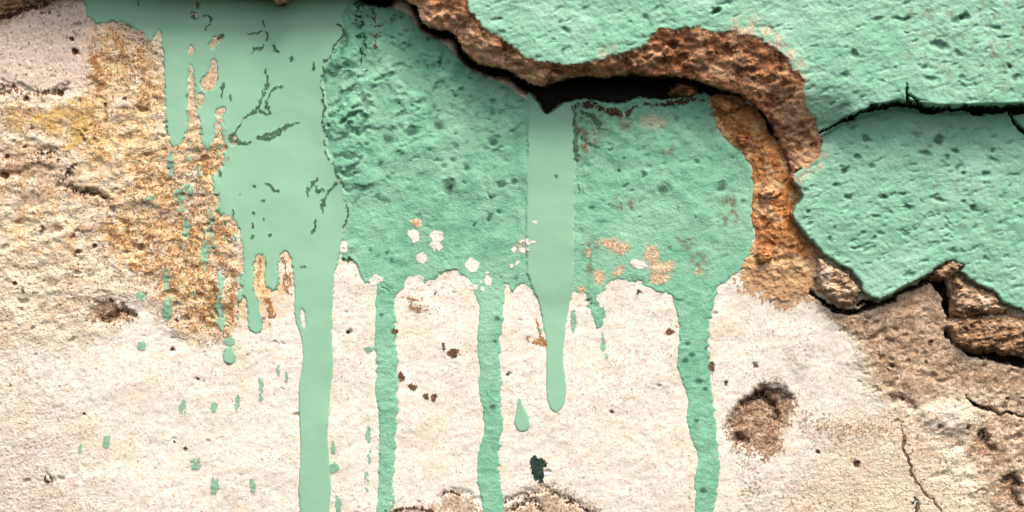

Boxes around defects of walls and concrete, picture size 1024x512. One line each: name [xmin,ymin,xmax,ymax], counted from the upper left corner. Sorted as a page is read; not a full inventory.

peeling [185,34,237,151]
spalling [405,0,827,314]
crack [819,83,1024,135]
peeling [369,274,384,286]